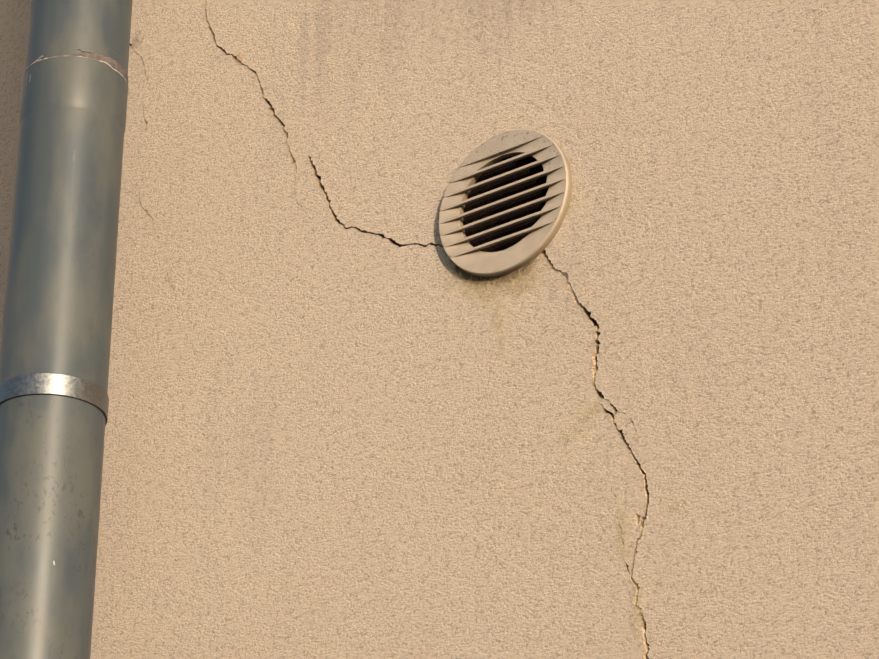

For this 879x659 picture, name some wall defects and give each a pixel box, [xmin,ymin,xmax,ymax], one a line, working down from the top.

crack [204,0,443,248]
crack [540,249,651,659]